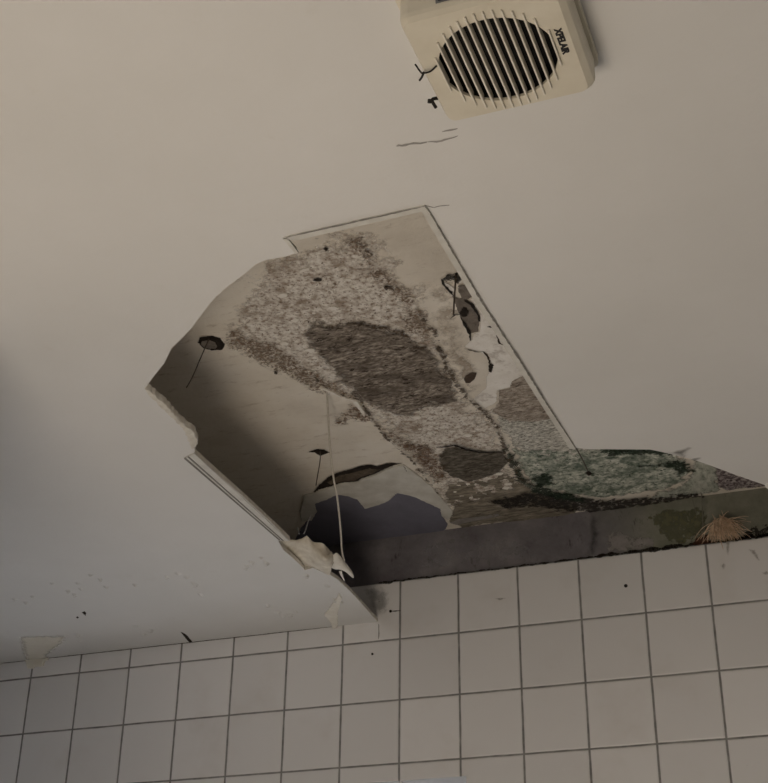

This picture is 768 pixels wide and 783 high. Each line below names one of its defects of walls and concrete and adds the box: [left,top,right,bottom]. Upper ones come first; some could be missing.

crack [397,128,458,147]
spalling [145,384,198,449]
peeling [234,232,550,581]
damp [227,330,768,584]